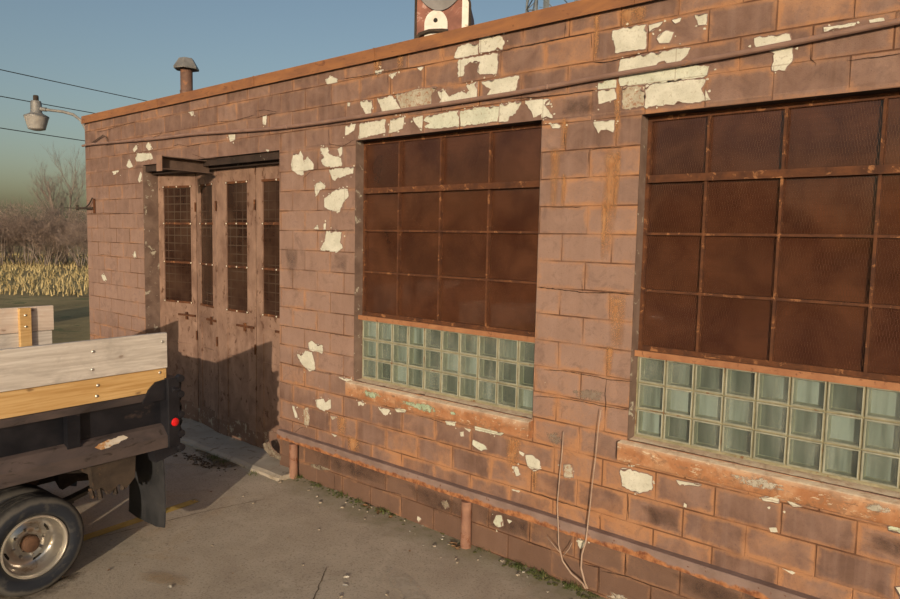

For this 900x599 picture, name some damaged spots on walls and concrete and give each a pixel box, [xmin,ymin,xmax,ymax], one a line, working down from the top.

peeling [694,13,708,30]
peeling [593,17,716,134]
peeling [291,33,568,253]
peeling [297,340,323,373]
peeling [619,465,655,495]